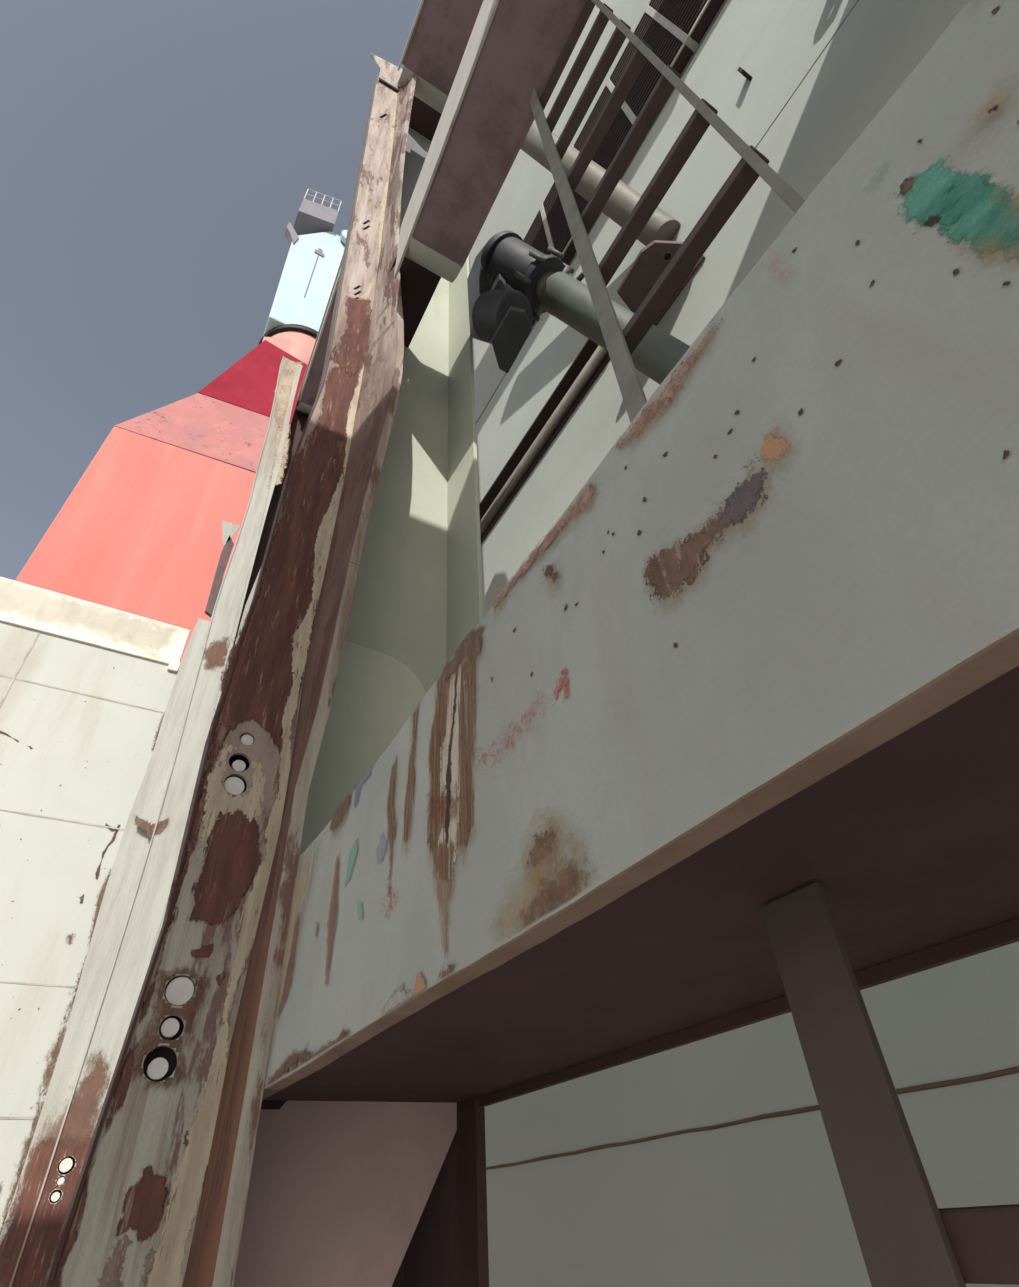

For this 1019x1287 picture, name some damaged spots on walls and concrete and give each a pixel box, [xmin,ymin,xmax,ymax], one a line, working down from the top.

peeling [894,177,914,198]
peeling [923,216,942,227]
rust [204,637,229,669]
rust [134,814,170,838]
rust [387,655,477,979]
rust [497,821,586,930]
rust [0,870,111,1235]